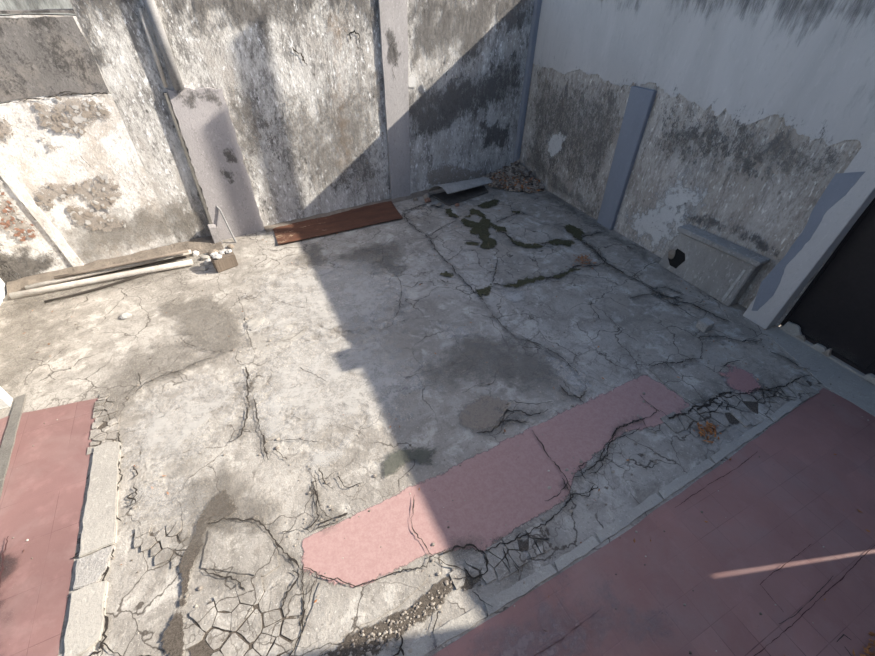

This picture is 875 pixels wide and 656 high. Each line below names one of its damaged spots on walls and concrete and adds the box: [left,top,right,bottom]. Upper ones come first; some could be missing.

damp [386,30,401,66]
damp [410,0,533,68]
peeling [33,96,112,151]
damp [176,71,386,194]
damp [409,44,523,149]
flaking render [0,180,42,242]
peeling [31,173,126,232]
crack [132,298,354,459]
crack [207,204,817,656]
crack [116,431,138,521]
crack [89,545,151,656]
spalling [449,523,552,590]